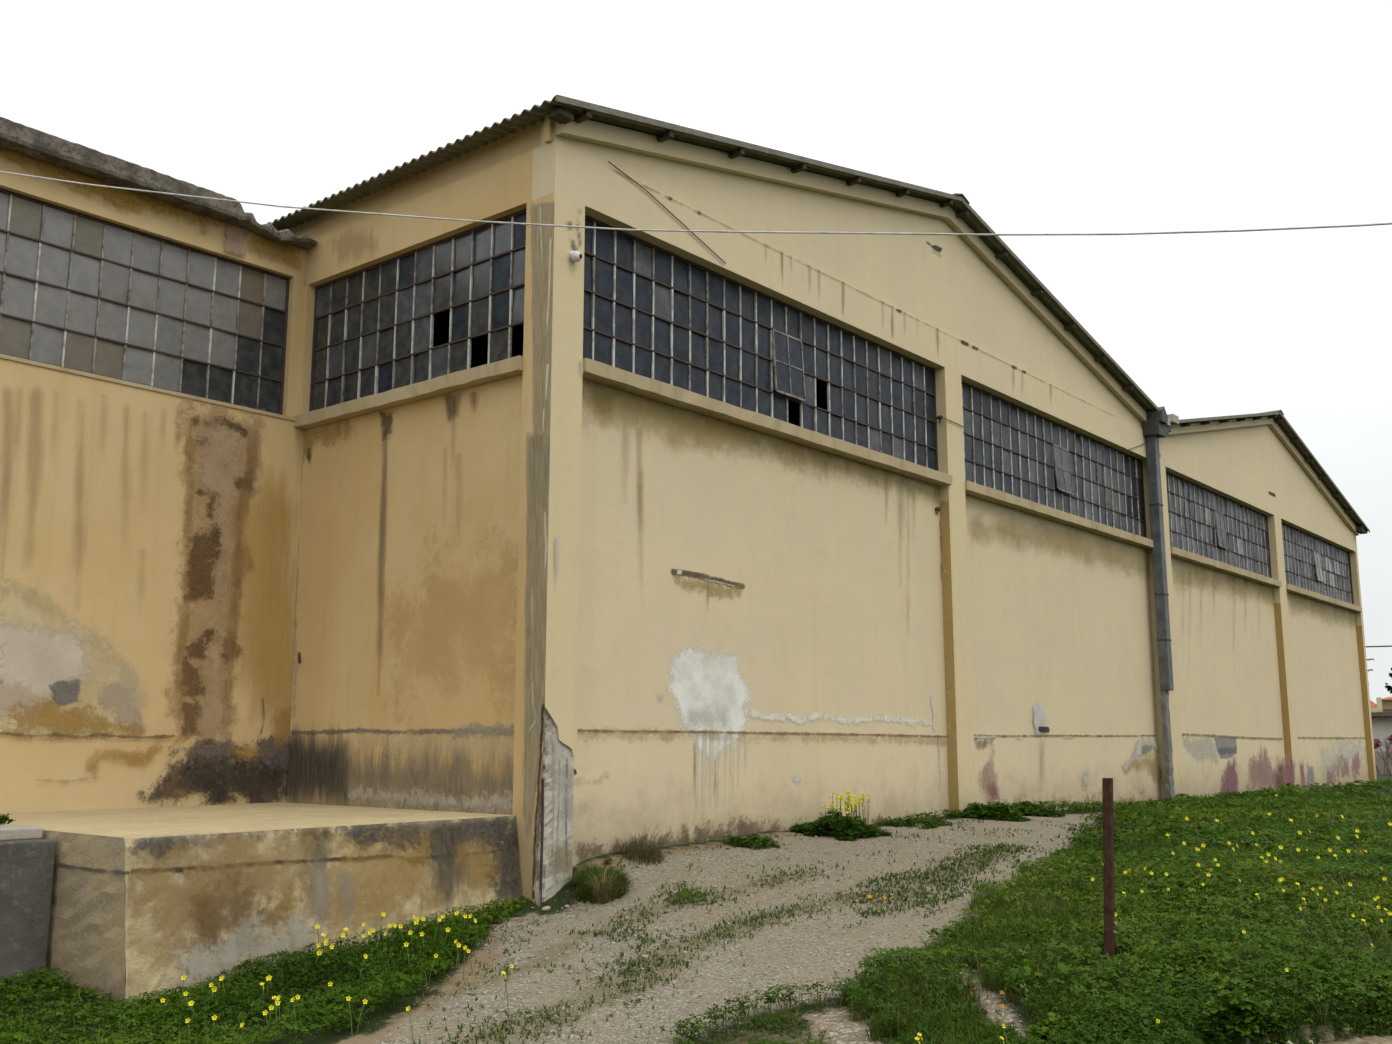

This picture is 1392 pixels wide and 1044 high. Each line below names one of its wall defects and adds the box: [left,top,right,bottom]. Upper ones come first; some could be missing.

peeling [0,579,144,740]
water stain [134,399,523,902]
peeling [1182,737,1237,761]